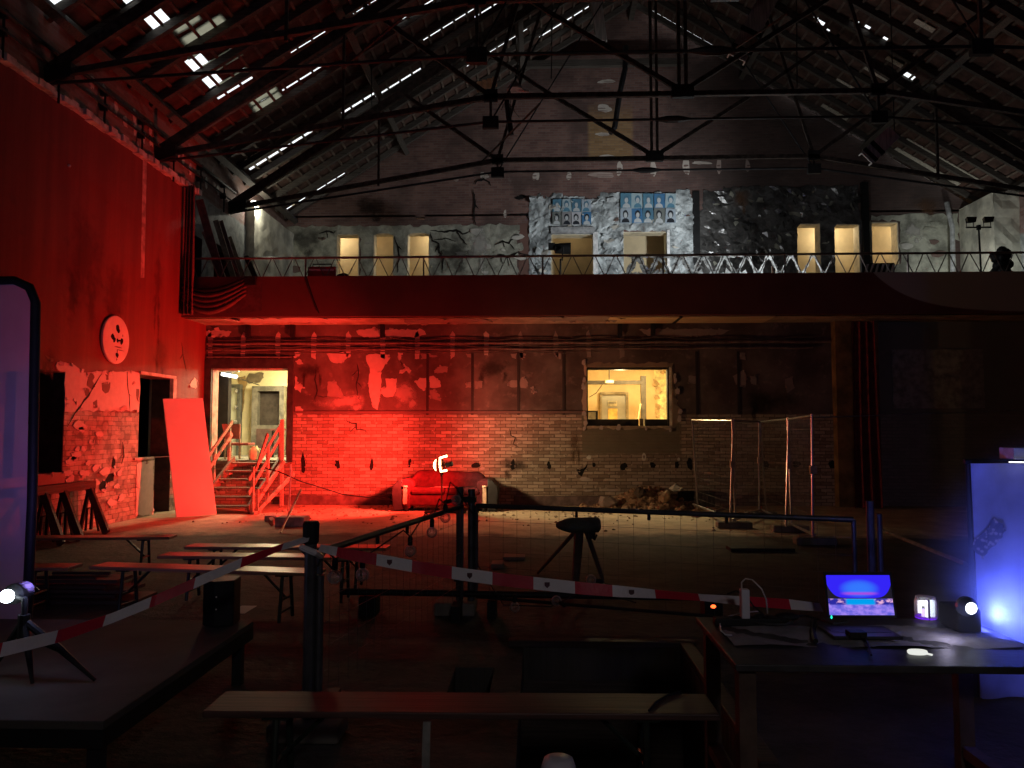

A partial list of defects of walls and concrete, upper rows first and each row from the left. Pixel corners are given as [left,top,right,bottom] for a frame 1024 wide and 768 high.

crack [430,178,491,270]
crack [491,239,528,264]
crack [67,375,101,427]
peeling [55,361,140,413]
peeling [294,351,305,393]
peeling [327,380,346,398]
peeling [327,352,347,363]
peeling [366,353,448,410]
peeling [507,376,537,394]
spalling [581,359,696,432]
spalling [99,456,120,492]